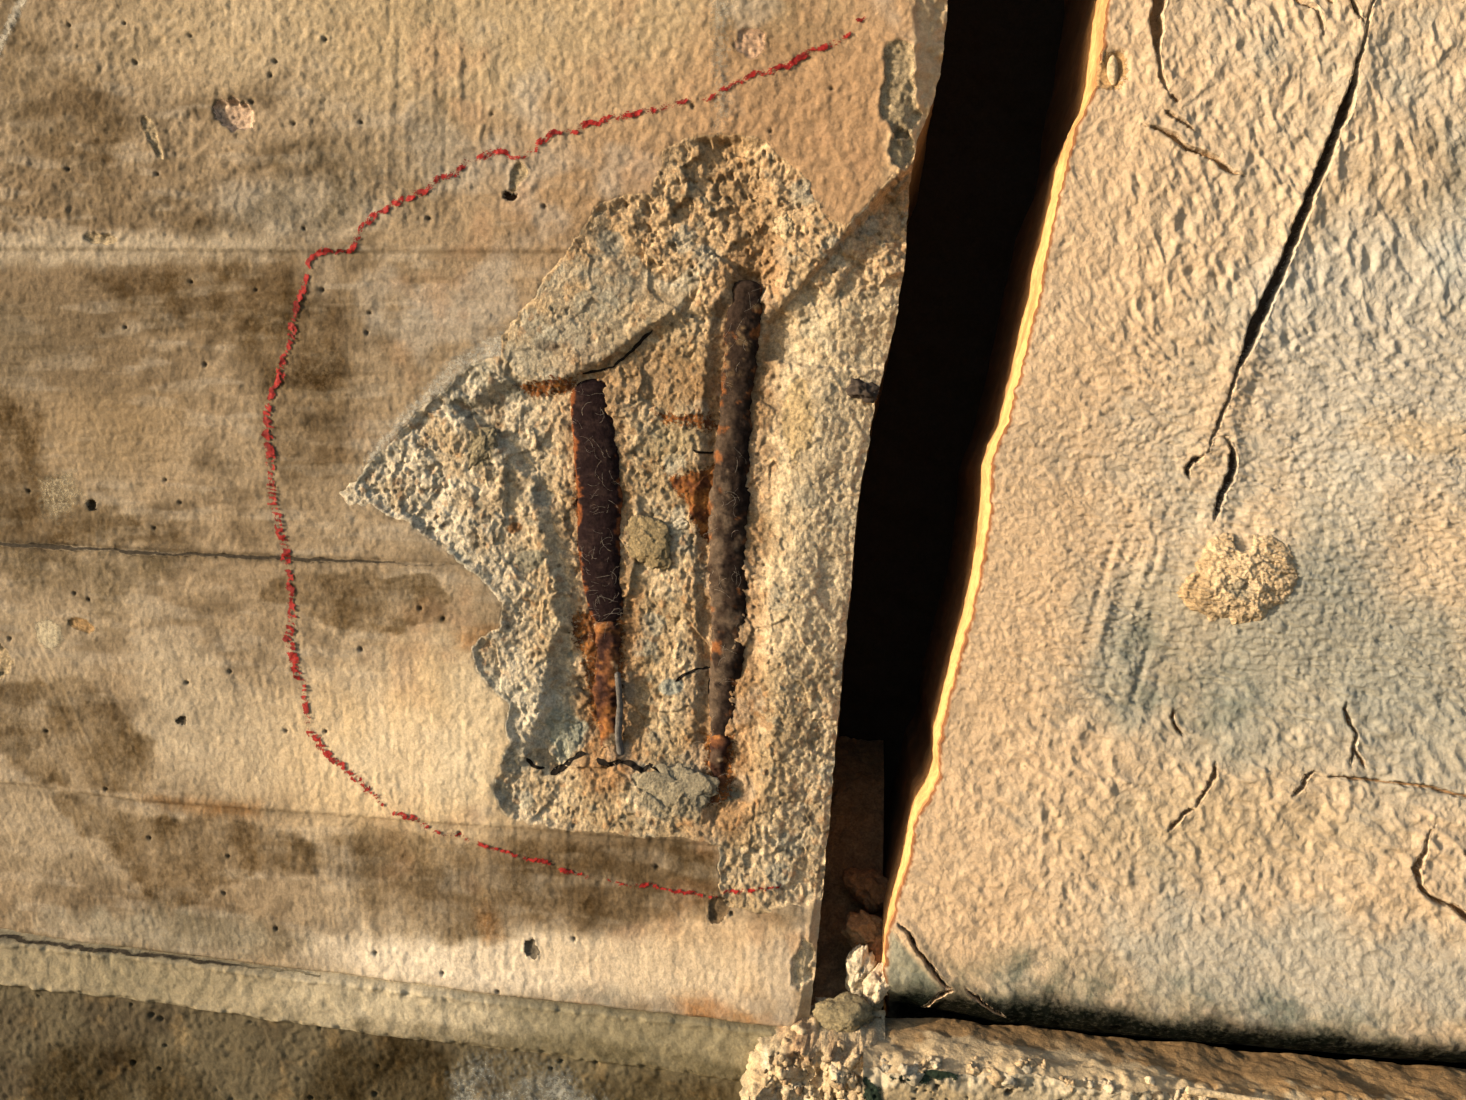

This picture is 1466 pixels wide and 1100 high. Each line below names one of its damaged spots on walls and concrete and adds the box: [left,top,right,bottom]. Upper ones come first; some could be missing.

crack [1143,0,1246,177]
crack [1184,0,1376,522]
water stain [364,333,504,462]
water stain [40,473,81,517]
spalling [339,38,922,925]
efflorescence [35,620,63,651]
rust [568,611,602,729]
rust [702,731,739,807]
crack [896,923,1006,1018]